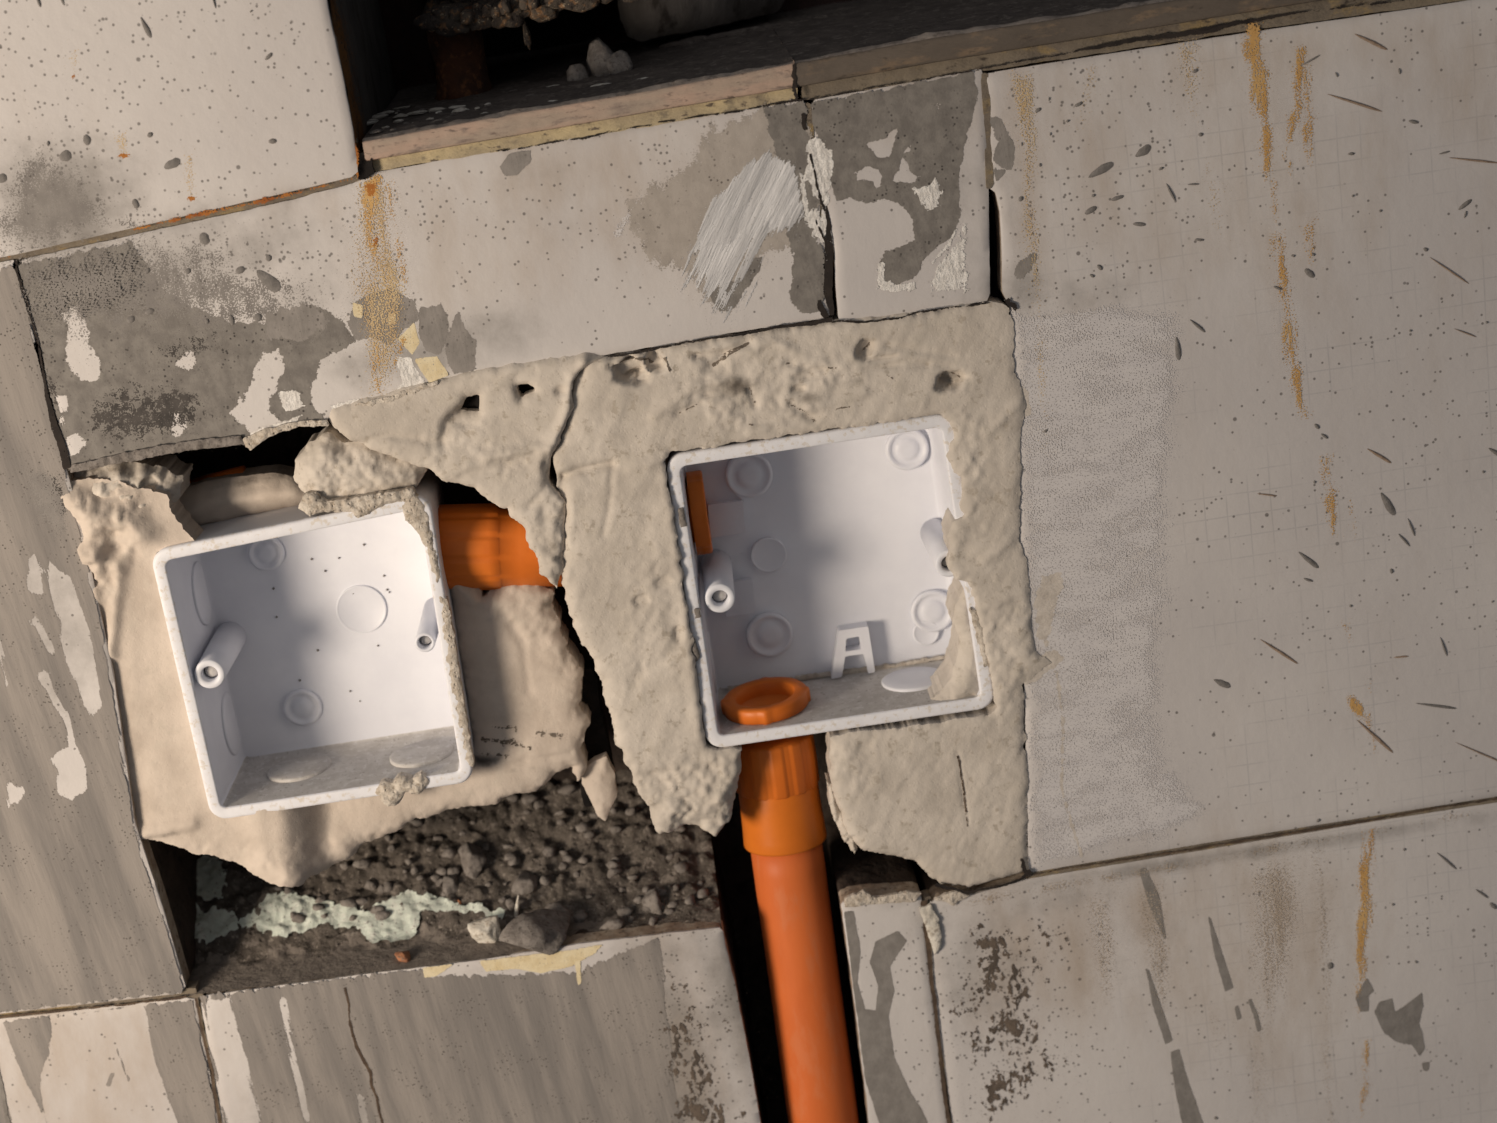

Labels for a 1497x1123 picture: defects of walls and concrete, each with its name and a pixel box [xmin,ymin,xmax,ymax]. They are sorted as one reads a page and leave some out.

damp [0,142,346,364]
rust [133,0,408,396]
crack [490,0,1404,357]
rust [1240,18,1315,419]
spalling [70,312,448,473]
peeling [195,855,505,963]
crack [344,987,383,1123]
damp [945,812,1479,1123]
rust [1353,829,1378,1019]